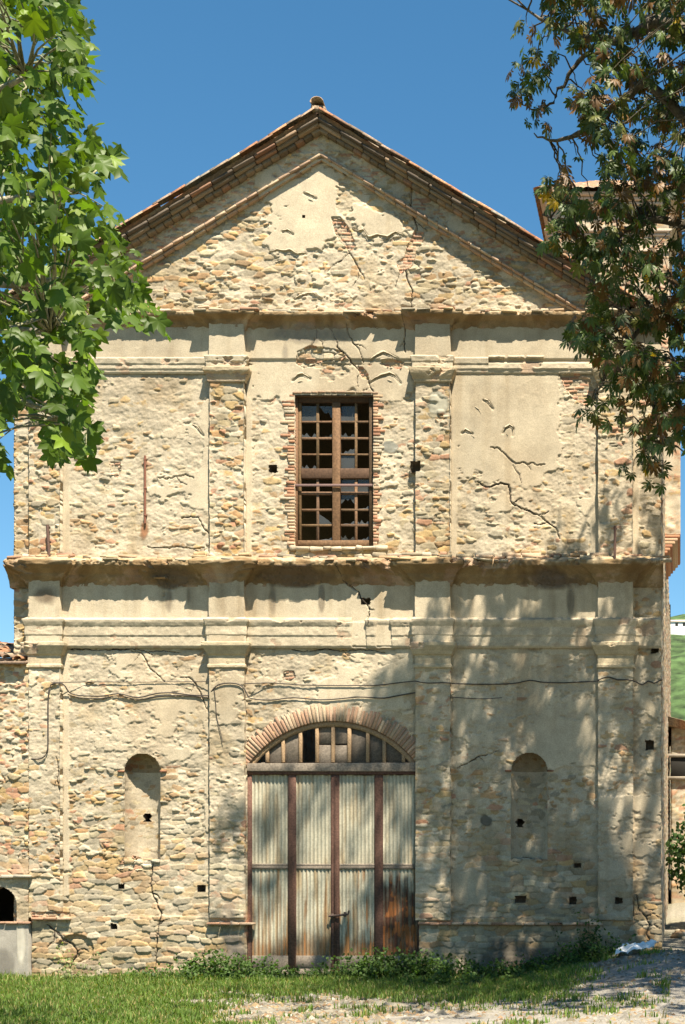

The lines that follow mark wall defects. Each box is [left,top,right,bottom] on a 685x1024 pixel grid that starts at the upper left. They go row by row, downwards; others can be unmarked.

spalling [332,217,424,273]
crack [312,323,373,390]
spalling [559,373,597,407]
spalling [109,462,122,477]
crack [478,447,560,539]
crack [335,565,374,623]
spalling [115,855,153,871]
spalling [31,912,70,922]
crack [150,863,170,973]
corrosion [304,876,417,956]